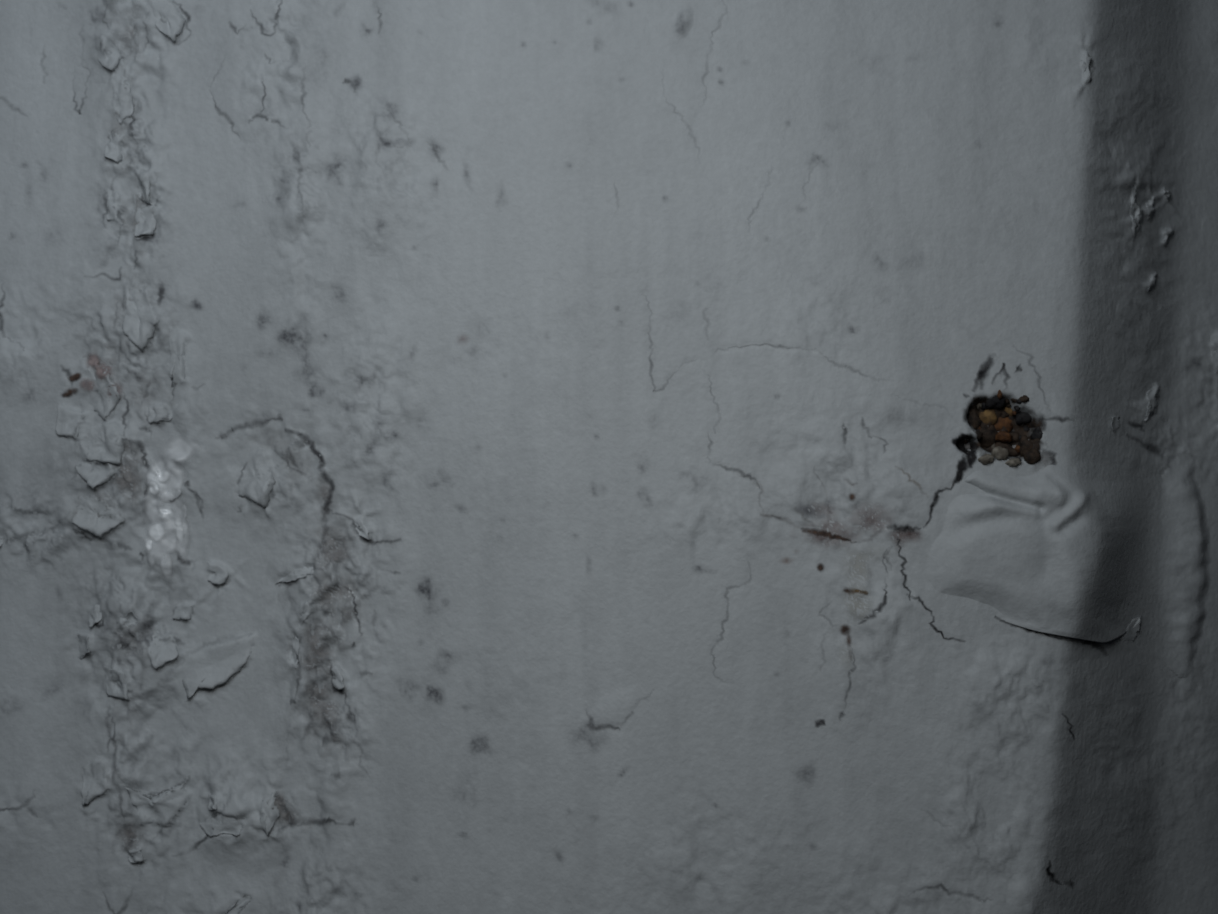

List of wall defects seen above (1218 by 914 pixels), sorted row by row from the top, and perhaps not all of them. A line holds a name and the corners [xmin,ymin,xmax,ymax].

peeling [55,355,181,538]
peeling [238,450,276,508]
peeling [298,434,324,466]
crack [808,530,850,541]
crack [871,473,962,639]
peeling [78,604,139,659]